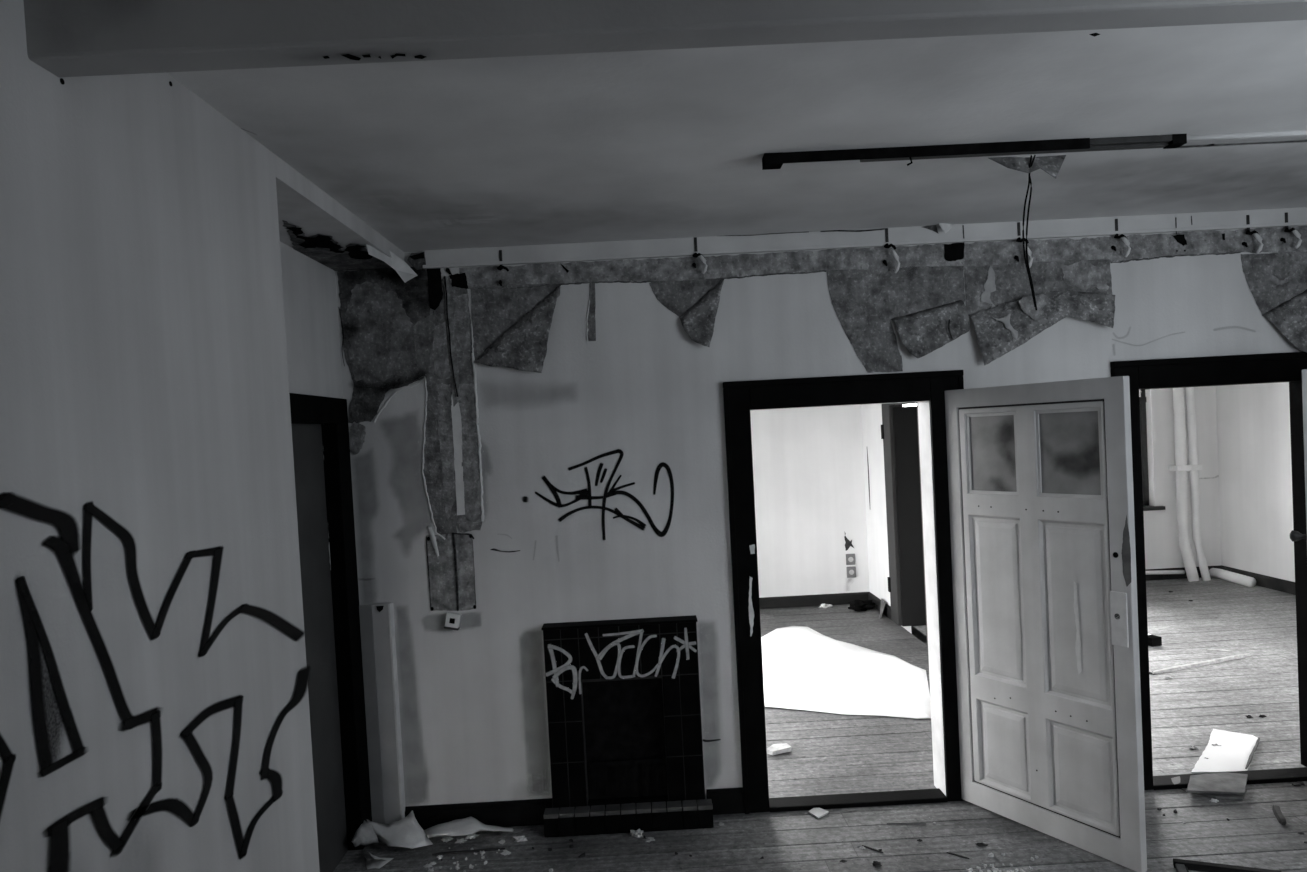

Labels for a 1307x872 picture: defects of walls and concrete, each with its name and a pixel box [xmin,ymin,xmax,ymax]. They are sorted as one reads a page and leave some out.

peeling [282,220,1307,611]